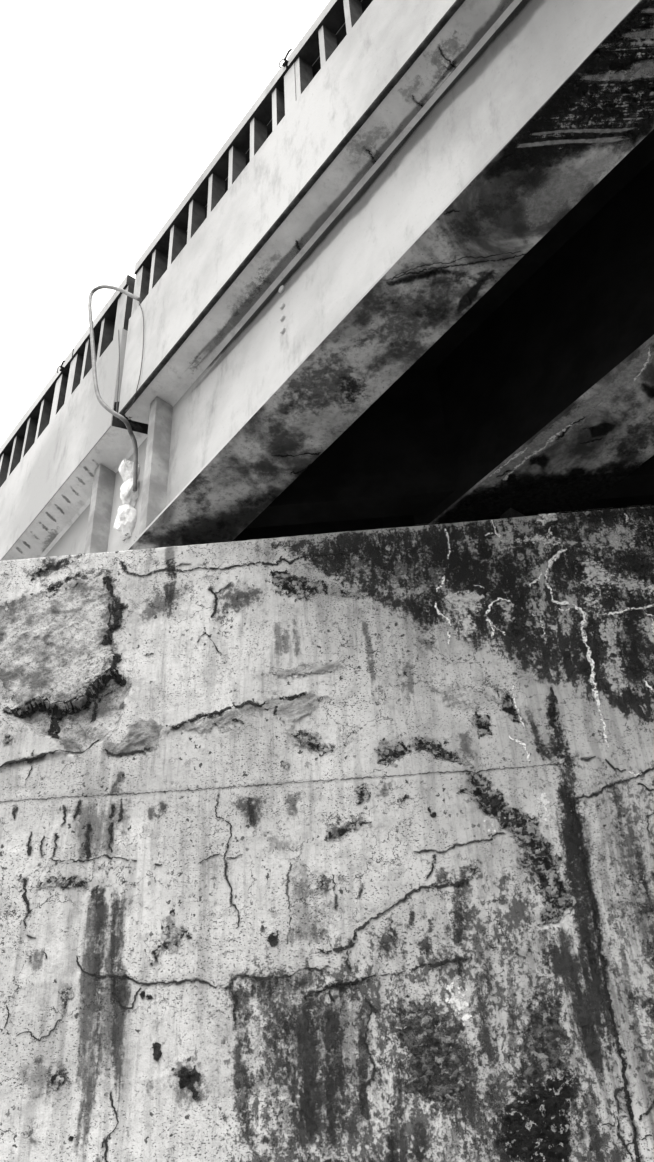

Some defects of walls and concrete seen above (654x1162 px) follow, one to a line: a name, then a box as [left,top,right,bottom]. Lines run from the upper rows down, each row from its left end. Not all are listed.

water stain [217,0,529,358]
water stain [139,472,302,617]
spalling [0,553,184,758]
spalling [290,730,335,757]
water stain [217,347,654,1162]
crack [549,687,558,735]
crack [22,878,36,939]
water stain [76,888,131,1146]
crack [50,854,162,866]
crack [199,794,240,927]
crack [76,832,505,1103]
crack [571,756,654,1162]